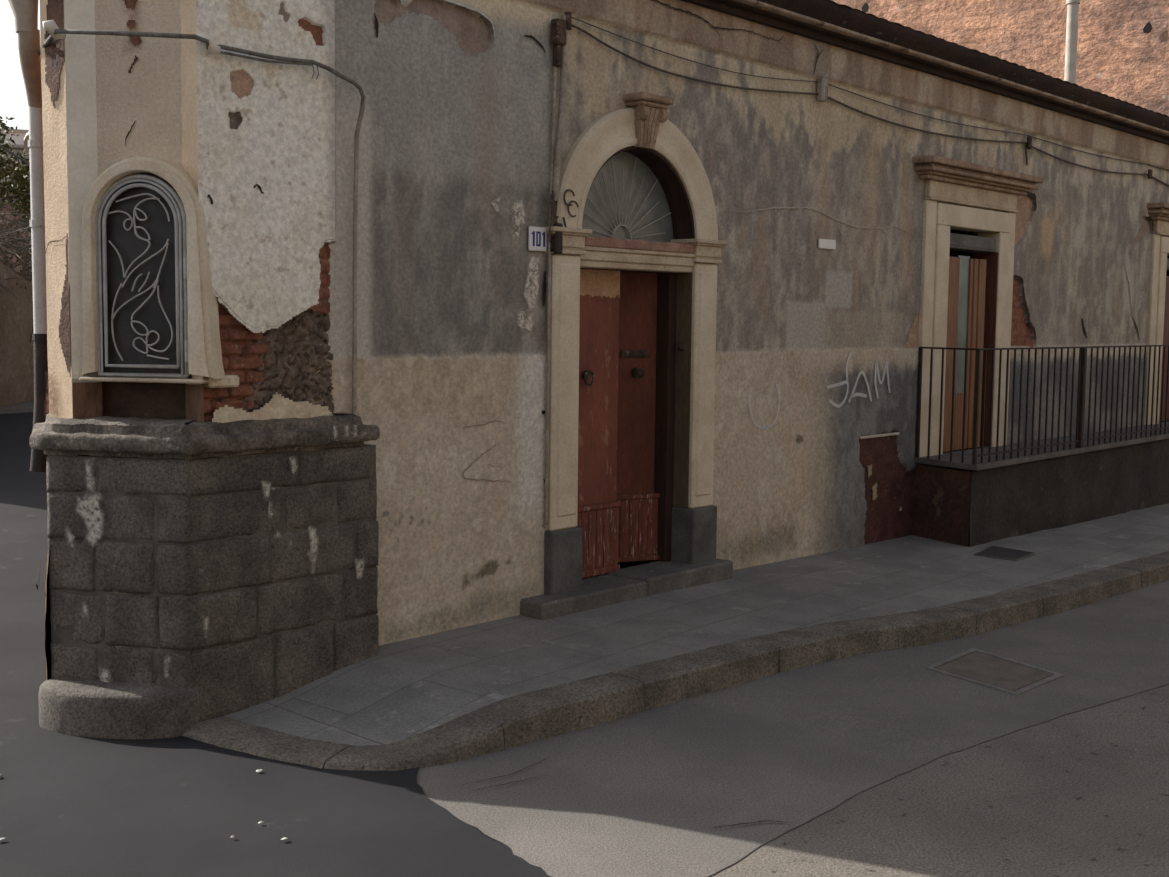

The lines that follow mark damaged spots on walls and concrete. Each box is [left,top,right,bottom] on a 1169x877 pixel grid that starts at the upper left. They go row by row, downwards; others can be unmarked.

flaking render [278,3,324,46]
peeling [375,0,495,58]
flaking render [228,70,254,130]
flaking render [194,239,335,423]
flaking render [1011,279,1033,347]
efflorescence [67,466,102,544]